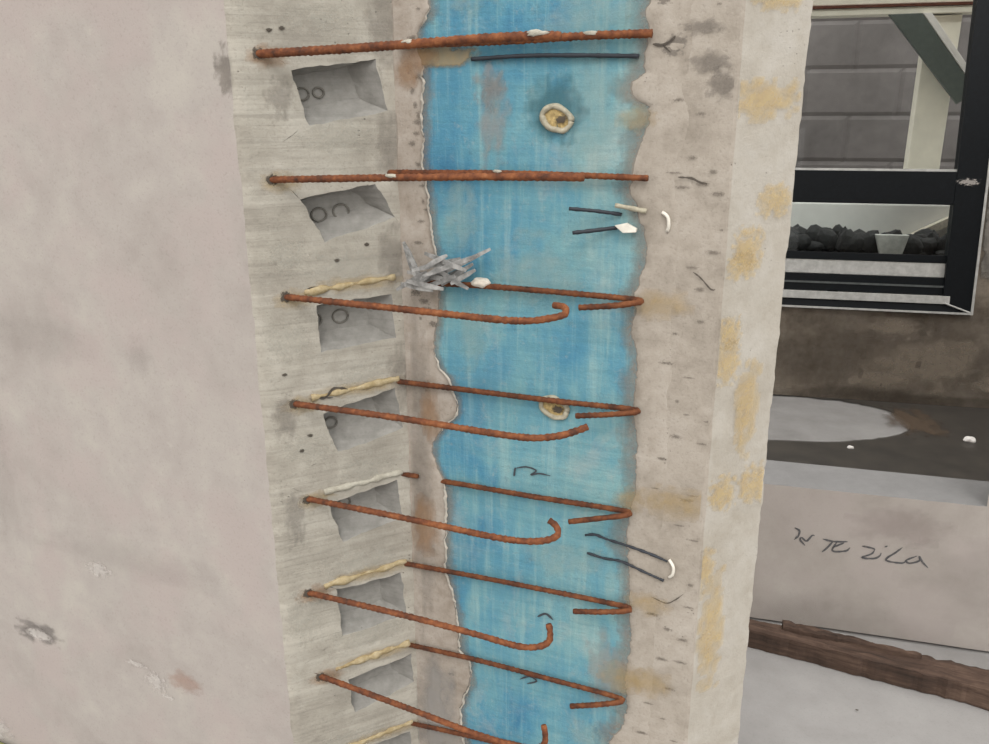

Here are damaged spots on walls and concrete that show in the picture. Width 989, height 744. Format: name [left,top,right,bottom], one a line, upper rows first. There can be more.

leakage [624,0,651,296]
peeling [253,0,734,744]
leakage [602,308,639,744]
leakage [766,342,989,482]
leakage [869,319,923,334]